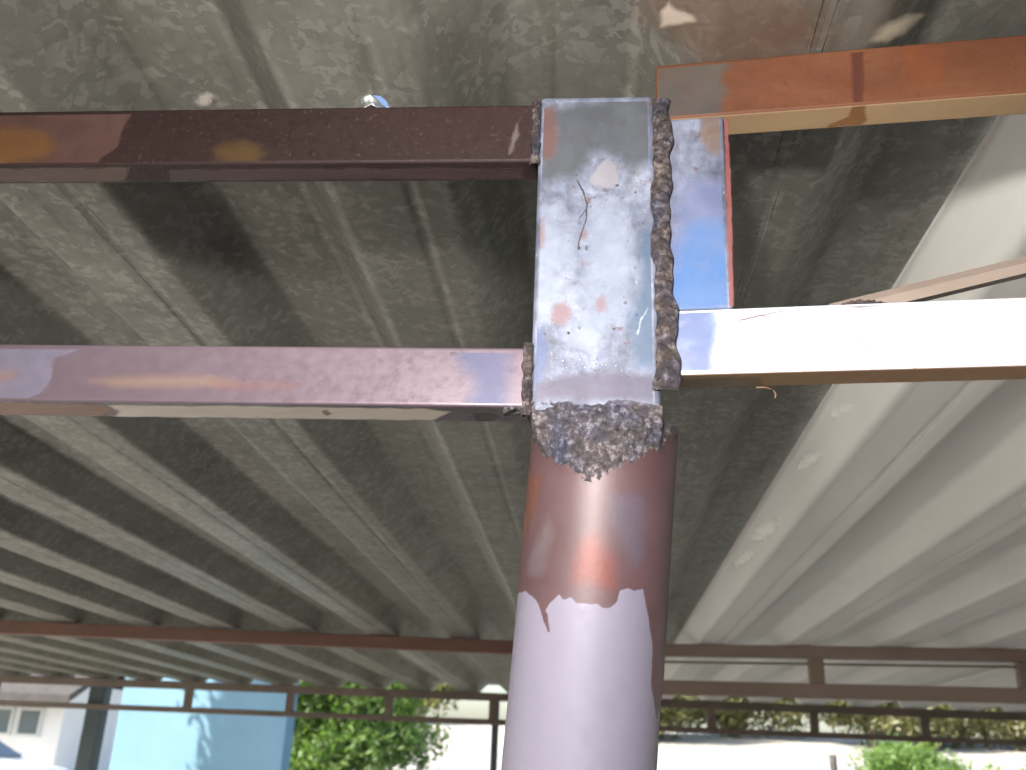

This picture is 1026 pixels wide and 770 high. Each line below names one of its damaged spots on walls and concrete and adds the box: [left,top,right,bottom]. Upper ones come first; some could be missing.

rust [827,52,867,128]
crack [577,181,588,250]
rust [517,434,678,719]